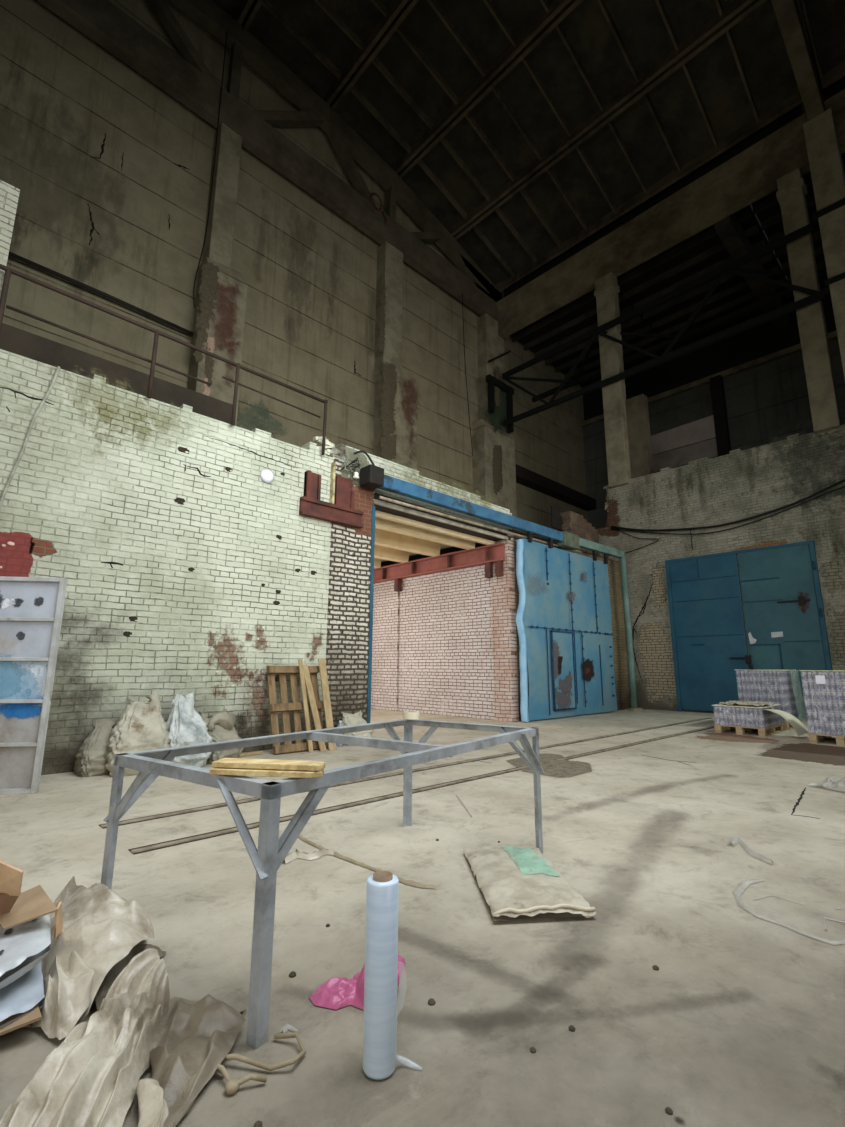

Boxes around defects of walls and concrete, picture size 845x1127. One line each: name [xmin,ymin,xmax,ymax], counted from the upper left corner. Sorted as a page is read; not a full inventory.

crack [94,133,123,170]
crack [87,203,100,245]
spalling [193,262,219,396]
crack [0,387,54,412]
peeling [0,532,57,577]
flaking render [307,633,323,661]
flaking render [208,626,279,720]
rust [552,640,572,711]
crack [791,787,820,819]